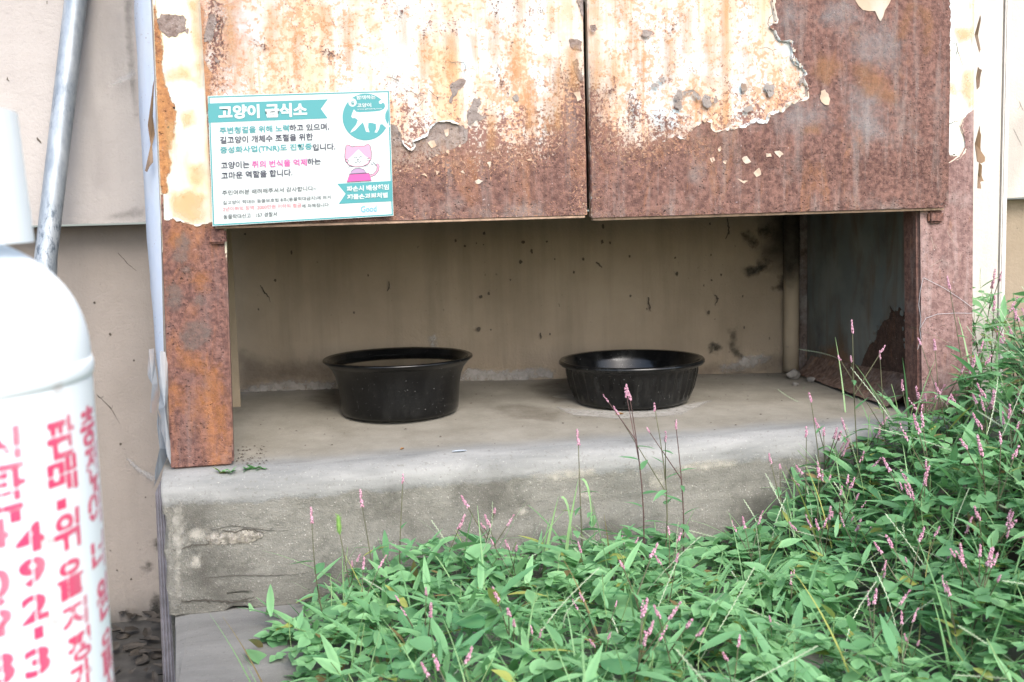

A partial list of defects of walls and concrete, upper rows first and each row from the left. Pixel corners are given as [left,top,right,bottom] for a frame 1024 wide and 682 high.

spalling [205,530,264,545]